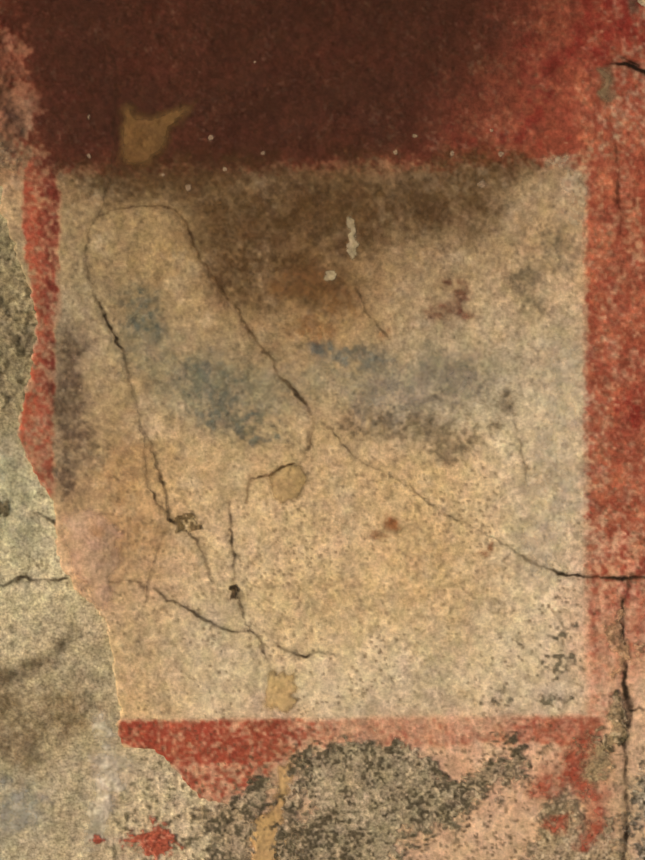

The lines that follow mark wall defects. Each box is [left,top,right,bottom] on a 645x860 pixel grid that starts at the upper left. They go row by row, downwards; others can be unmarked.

crack [615,61,645,75]
crack [187,225,208,268]
crack [98,302,123,350]
crack [282,379,307,405]
crack [257,442,311,478]
spalling [0,500,9,517]
crack [152,455,198,543]
crack [228,514,236,562]
crack [158,591,310,658]
spalling [519,610,645,860]
crack [550,569,645,860]
spalling [189,730,533,860]